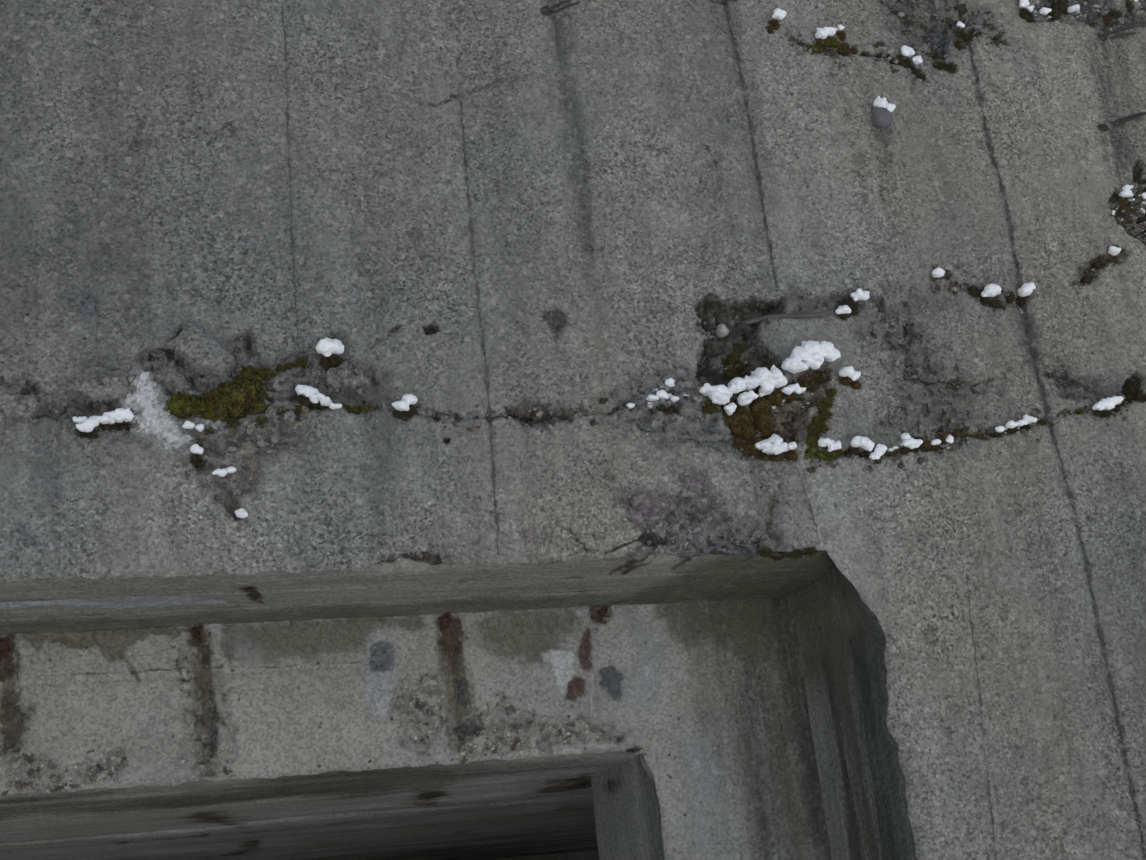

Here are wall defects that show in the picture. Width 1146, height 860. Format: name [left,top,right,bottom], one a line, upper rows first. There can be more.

crack [710,0,778,288]
crack [0,375,126,419]
water stain [122,370,193,452]
spalling [0,329,405,521]
water stain [543,308,567,339]
spalling [614,291,837,461]
crack [752,0,1146,860]
spalling [1071,245,1129,293]
rust [186,624,218,775]
rust [436,612,479,752]
rust [590,605,612,624]
water stain [612,552,918,860]